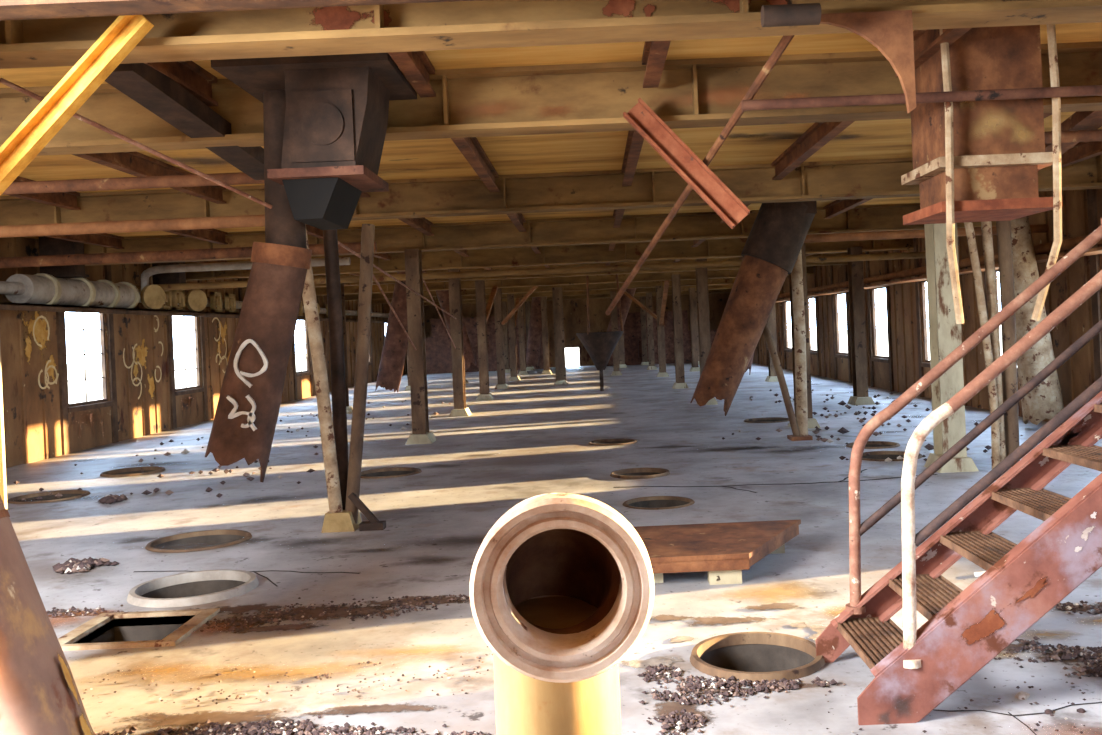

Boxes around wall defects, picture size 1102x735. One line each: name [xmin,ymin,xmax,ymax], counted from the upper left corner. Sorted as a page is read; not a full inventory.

peeling [1074,512,1096,552]